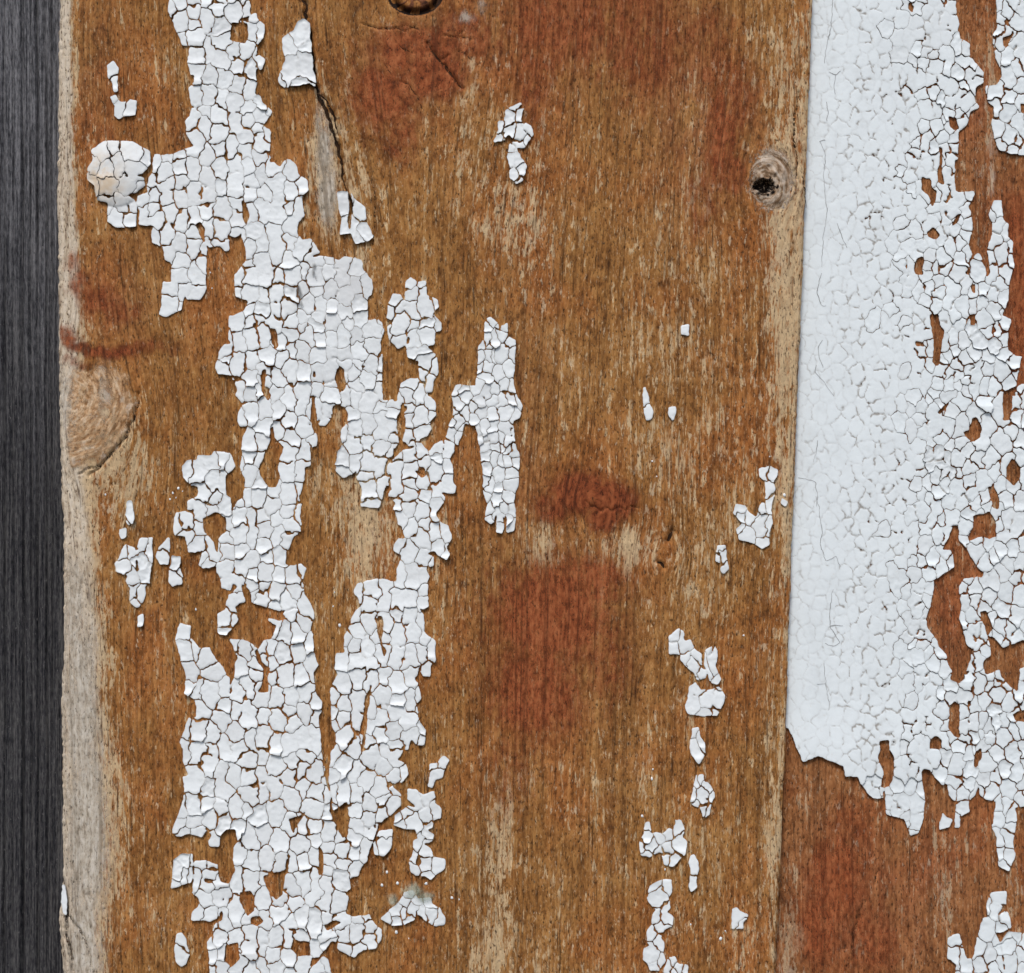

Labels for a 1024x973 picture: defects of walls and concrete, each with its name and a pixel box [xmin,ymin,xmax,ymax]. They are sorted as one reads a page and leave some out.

peeling [107,61,137,119]
crack [301,0,376,244]
peeling [494,103,533,184]
crack [793,0,847,306]
crack [81,395,139,473]
peeling [115,0,523,973]
crack [802,440,841,567]
peeling [733,0,1024,871]
peeling [669,628,725,817]
peeling [639,820,699,973]
peeling [731,907,748,929]
peeling [947,891,1024,973]